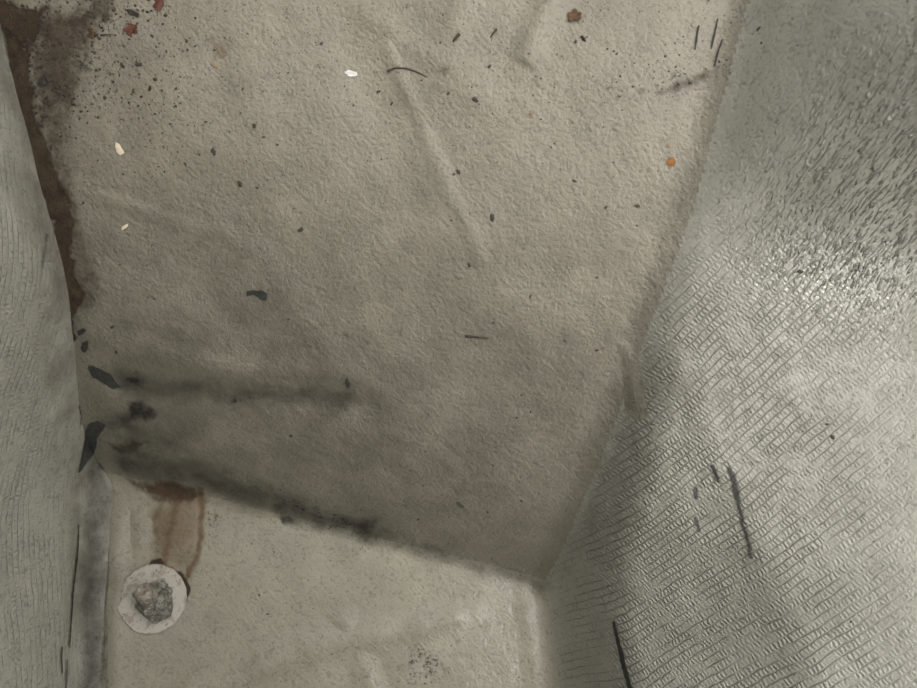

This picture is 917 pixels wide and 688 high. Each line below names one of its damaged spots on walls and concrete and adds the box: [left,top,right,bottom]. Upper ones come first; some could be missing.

damp [129,402,154,419]
corrosion [133,482,203,600]